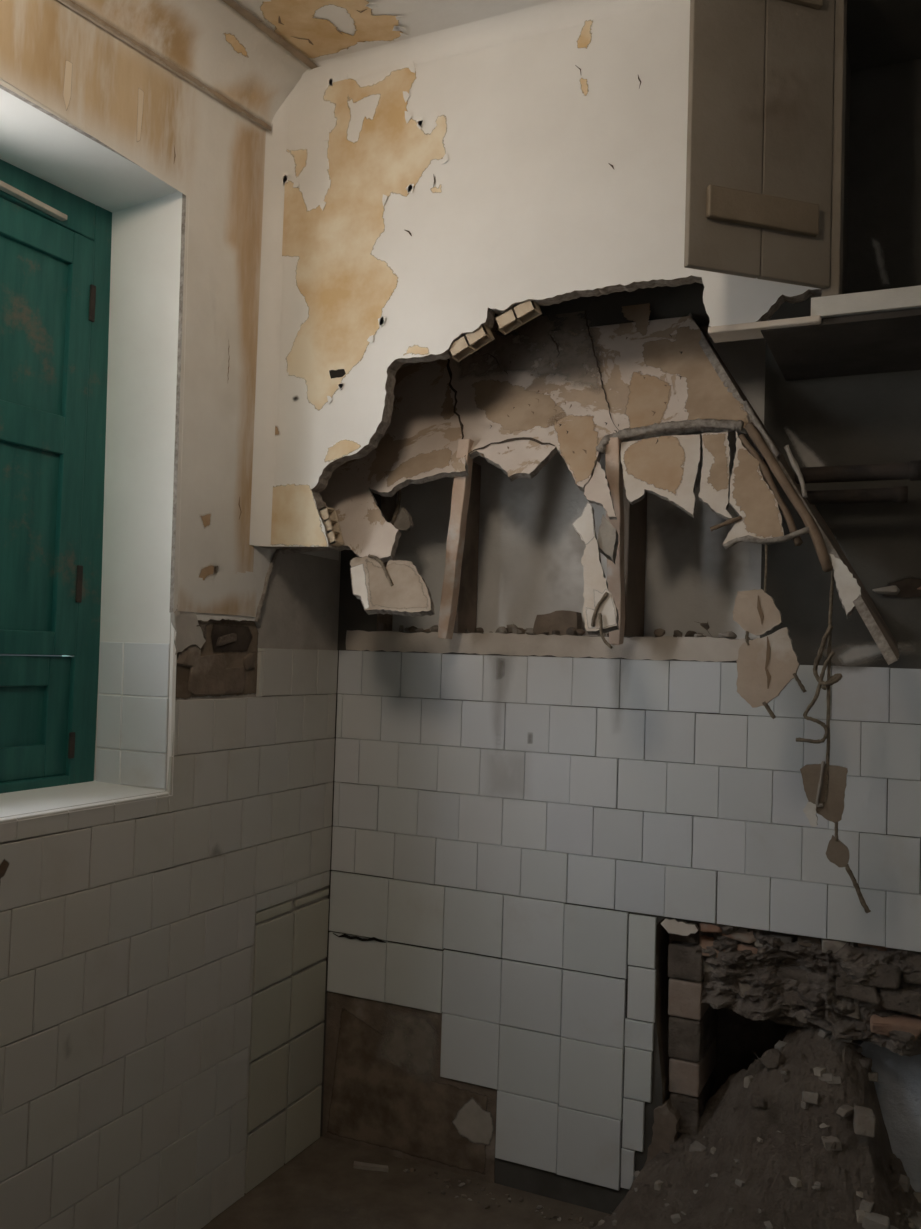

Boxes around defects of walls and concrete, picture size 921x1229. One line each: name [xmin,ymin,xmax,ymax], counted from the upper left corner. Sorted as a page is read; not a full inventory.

peeling [258,0,408,58]
peeling [282,61,449,410]
damp [0,0,302,617]
spalling [448,300,542,362]
peeling [325,440,360,462]
spalling [572,402,744,454]
spalling [389,507,413,531]
spalling [171,484,345,699]
spalling [822,644,883,668]
corrosion [0,859,9,883]
peeling [322,991,497,1183]